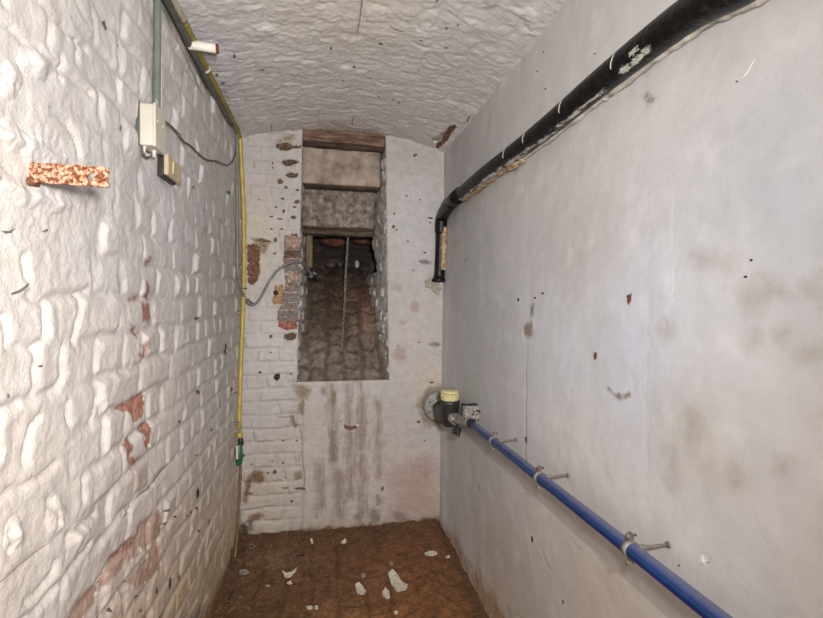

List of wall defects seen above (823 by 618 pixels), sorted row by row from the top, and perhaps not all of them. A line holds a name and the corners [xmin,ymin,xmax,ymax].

crack [357,0,405,35]
spalling [433,125,457,149]
flaking render [246,238,271,285]
spalling [272,234,301,341]
spalling [115,389,152,450]
peeling [69,509,162,618]